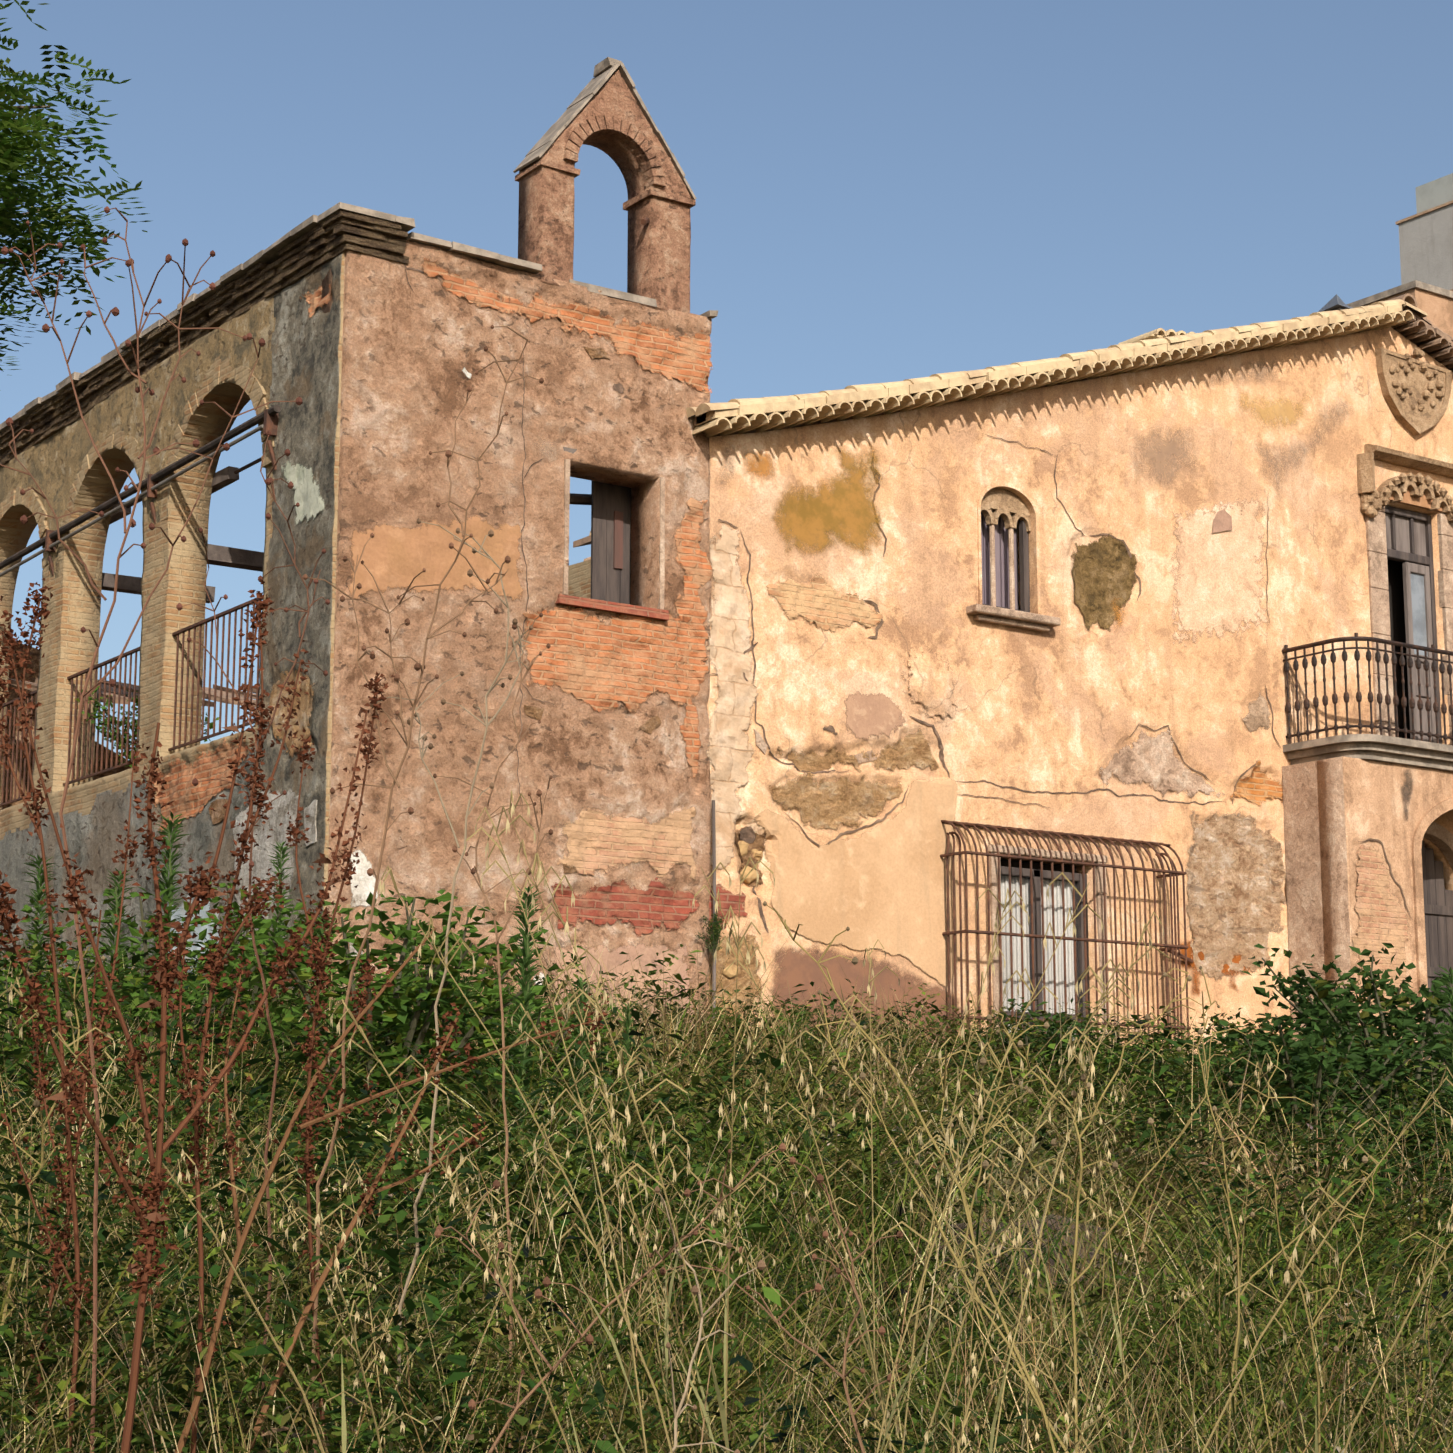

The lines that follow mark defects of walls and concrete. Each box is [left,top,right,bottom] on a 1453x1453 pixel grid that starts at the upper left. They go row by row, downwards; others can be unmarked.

peeling [281,461,324,526]
crack [985,434,1085,536]
flaking render [1071,533,1141,632]
flaking render [522,497,950,1022]
crack [959,780,1224,808]
peeling [153,737,318,956]
flaking render [1099,724,1286,981]
flaking render [1352,838,1412,1036]
damp [773,948,961,1050]